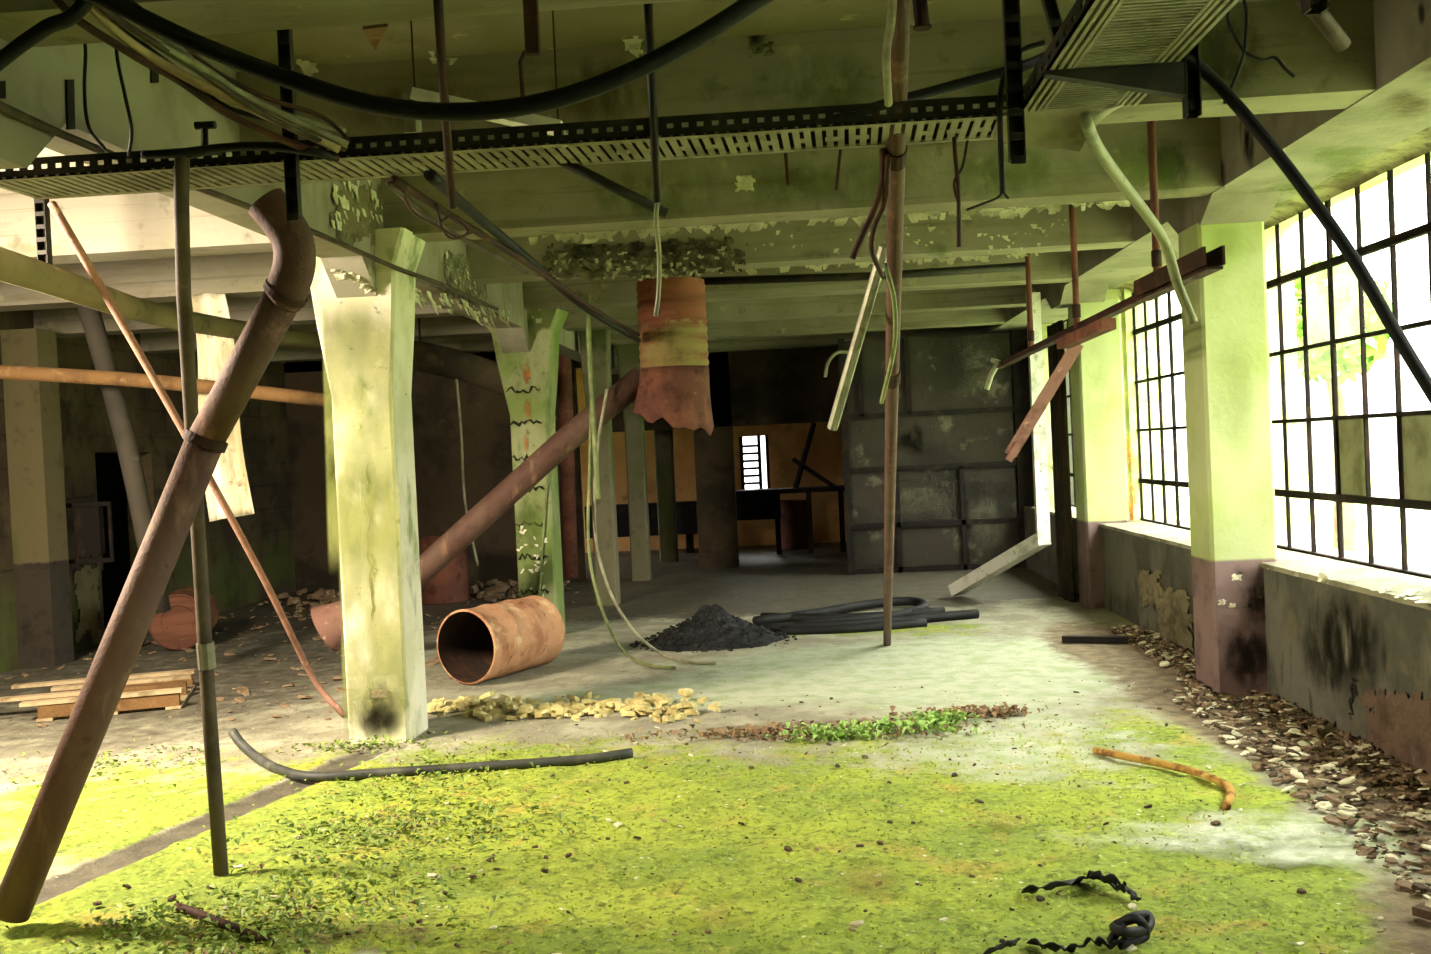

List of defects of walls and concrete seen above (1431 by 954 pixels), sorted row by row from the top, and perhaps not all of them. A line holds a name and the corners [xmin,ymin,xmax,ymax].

peeling [330,179,383,246]
spalling [528,220,802,283]
peeling [779,216,885,273]
peeling [905,200,1130,265]
peeling [415,250,513,329]
damp [323,320,404,718]
damp [1308,605,1375,684]